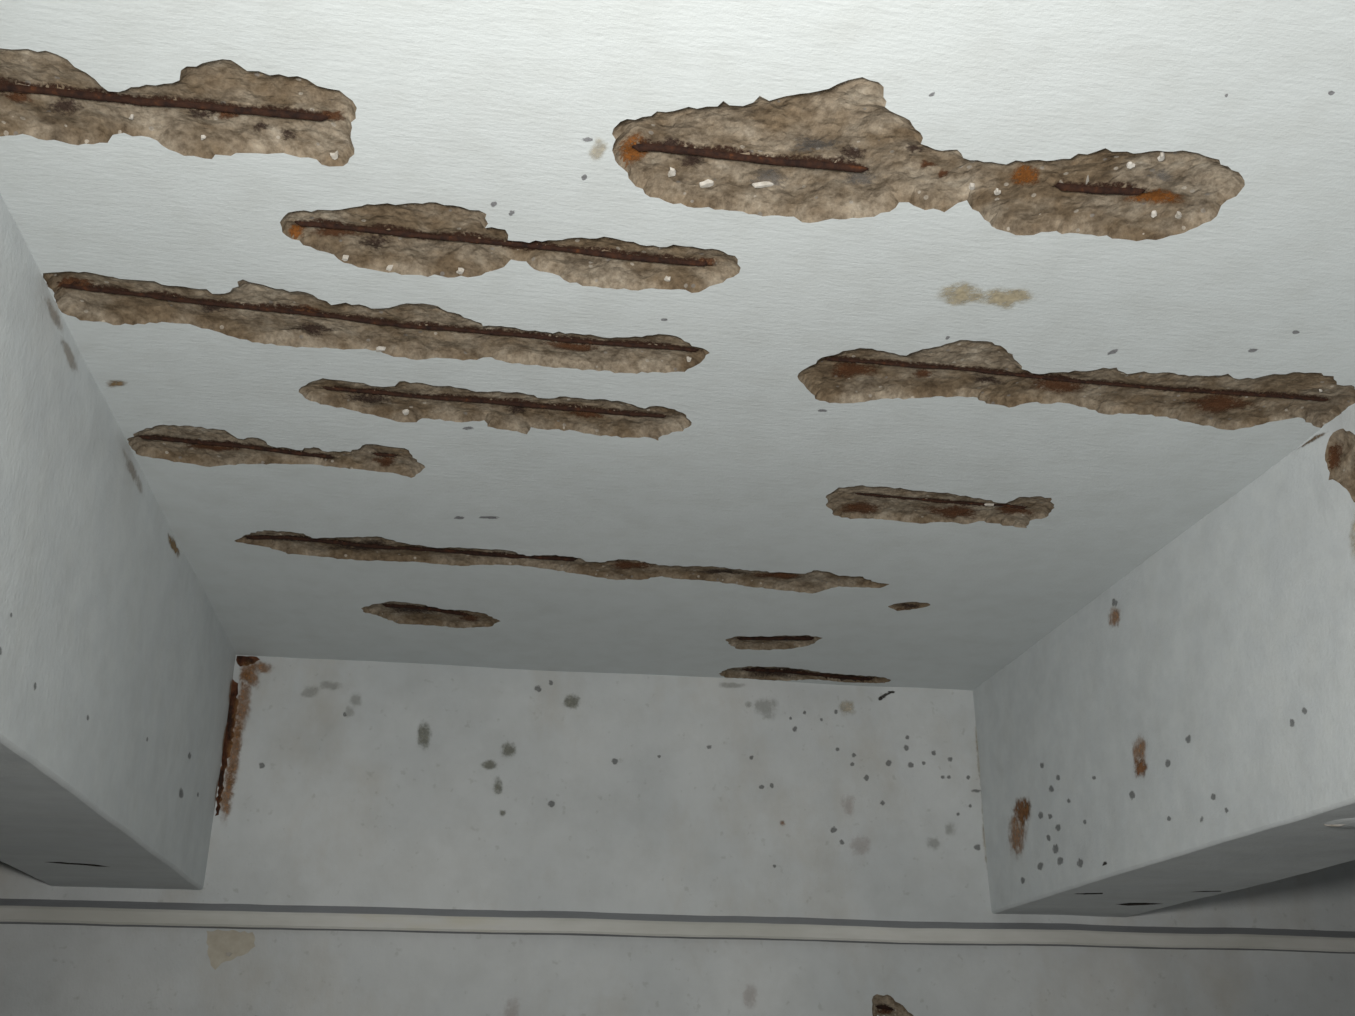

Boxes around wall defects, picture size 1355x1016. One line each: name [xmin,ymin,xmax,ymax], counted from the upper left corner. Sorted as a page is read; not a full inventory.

spalling [0,48,357,167]
spalling [612,77,1245,241]
spalling [280,202,740,293]
spalling [43,271,709,374]
spalling [127,425,425,478]
spalling [299,378,692,440]
spalling [797,340,1355,502]
spalling [826,485,1054,528]
spalling [235,530,889,594]
spalling [361,601,500,628]
rust [1011,799,1030,853]